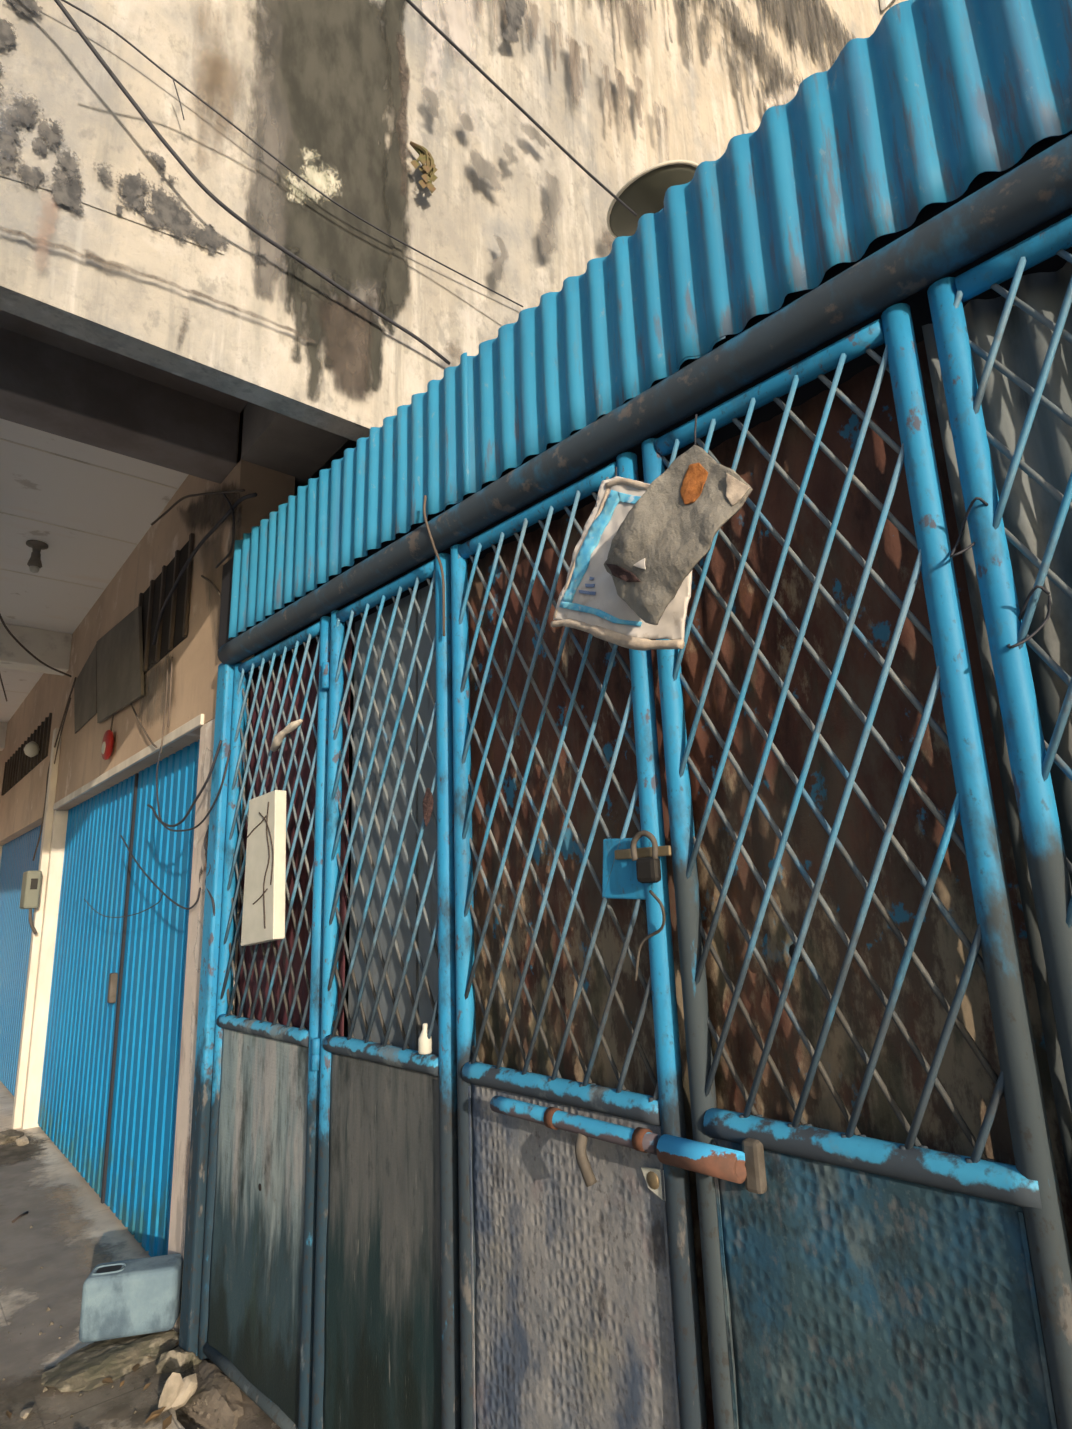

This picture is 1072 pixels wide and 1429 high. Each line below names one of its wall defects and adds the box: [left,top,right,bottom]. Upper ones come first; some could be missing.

leakage [0,0,43,132]
leakage [423,0,508,117]
leakage [522,0,855,161]
leakage [460,113,474,131]
leakage [48,167,85,214]
leakage [248,0,408,400]
leakage [470,143,518,190]
leakage [540,172,561,253]
leakage [492,237,508,280]
corrosion [680,463,708,505]